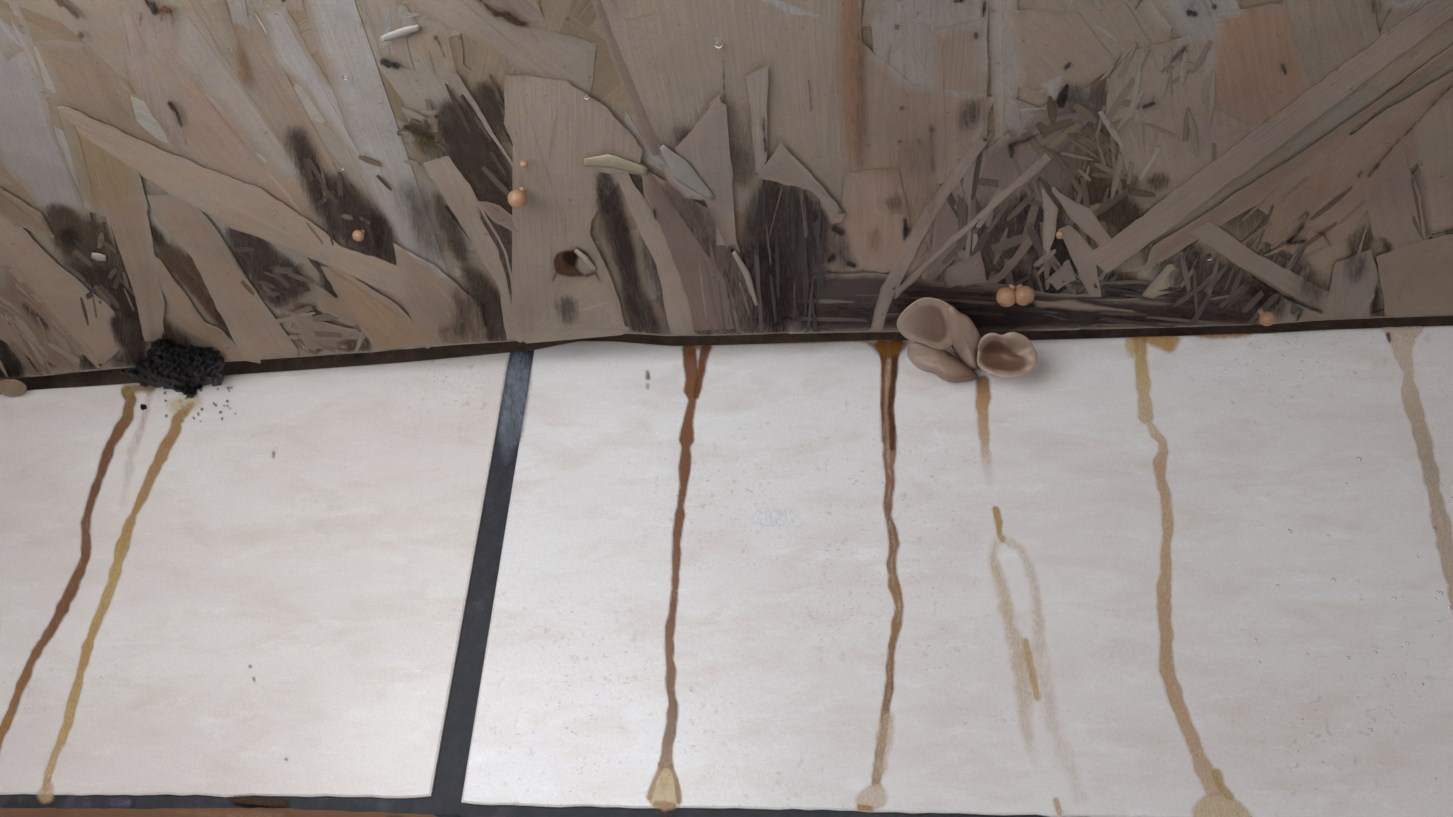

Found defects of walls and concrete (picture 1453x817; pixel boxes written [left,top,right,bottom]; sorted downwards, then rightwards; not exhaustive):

water stain [0,322,23,378]
water stain [47,205,190,369]
water stain [151,228,231,335]
water stain [0,385,236,802]